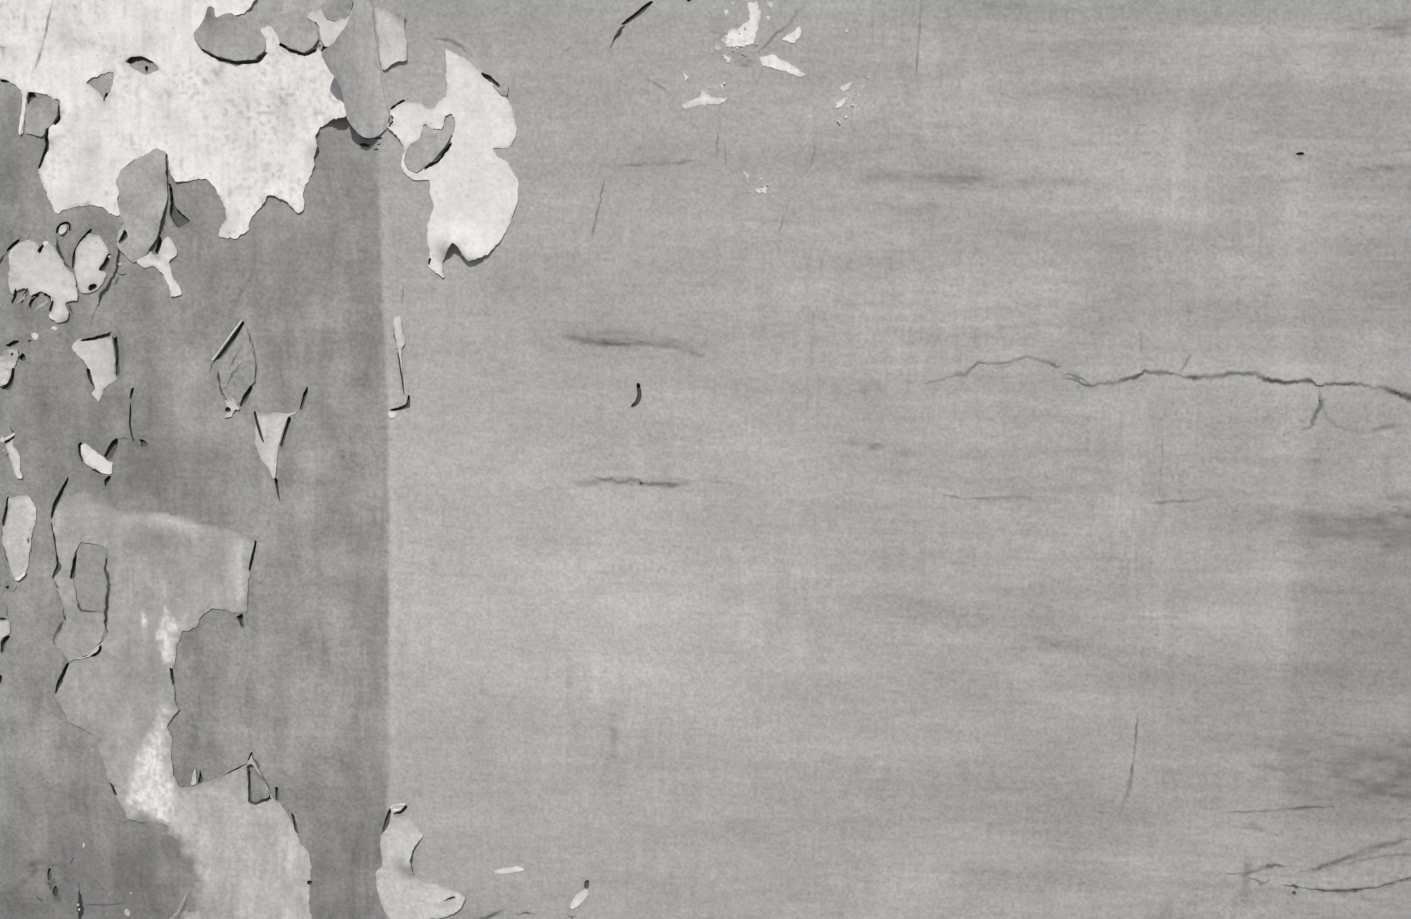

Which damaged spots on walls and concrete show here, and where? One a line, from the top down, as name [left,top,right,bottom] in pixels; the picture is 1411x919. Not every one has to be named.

spalling [610,0,657,48]
peeling [0,0,519,402]
spalling [212,318,311,504]
peeling [387,316,414,418]
crack [1263,378,1351,410]
peeling [0,427,316,919]
peeling [376,802,466,919]
peeling [567,877,593,918]